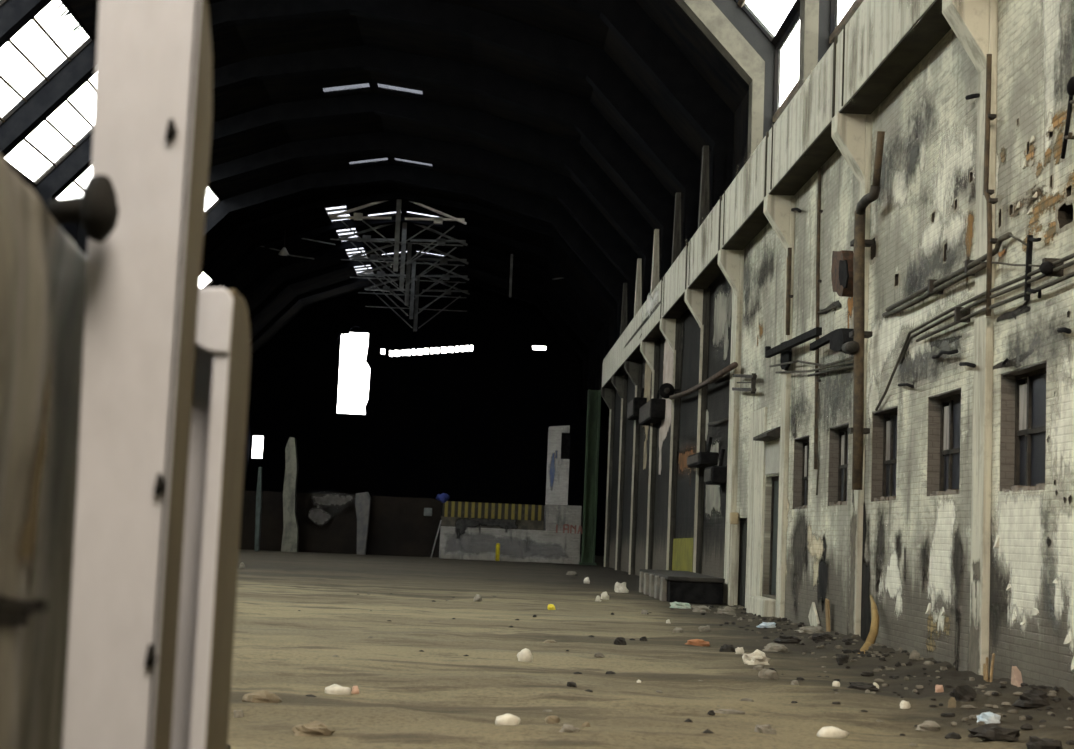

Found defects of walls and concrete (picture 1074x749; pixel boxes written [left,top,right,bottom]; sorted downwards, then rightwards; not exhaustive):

water stain [906,140,919,183]
spalling [998,108,1074,251]
water stain [790,511,829,612]
peeling [879,551,902,617]
peeling [925,498,956,652]
peeling [993,339,1074,671]